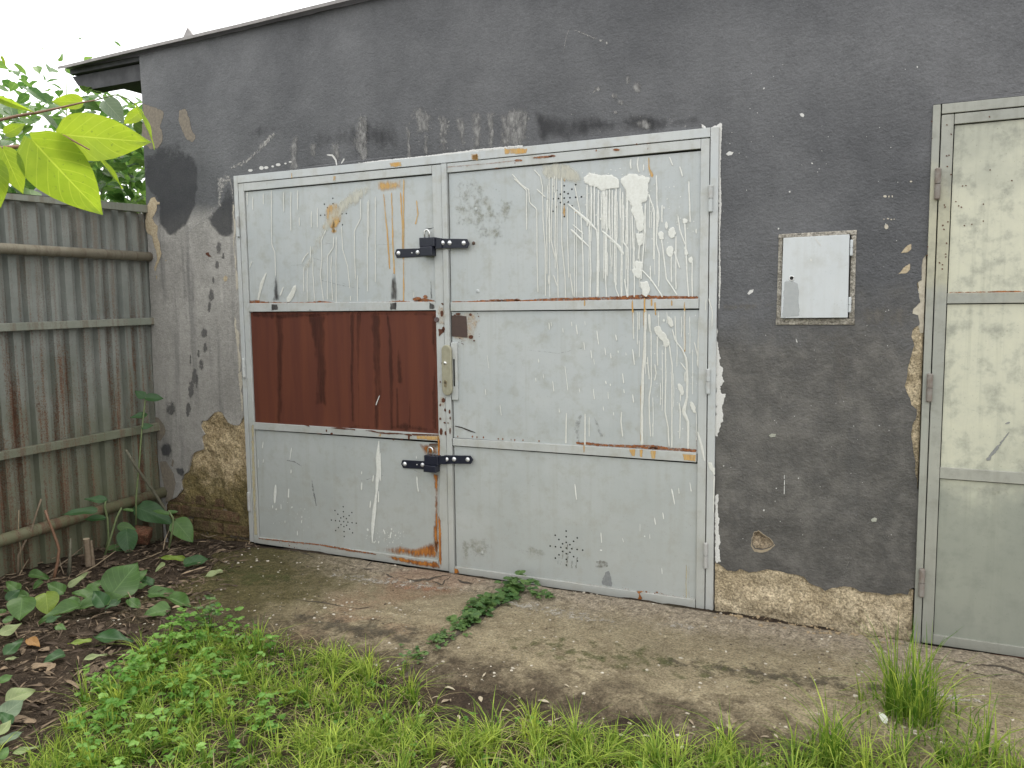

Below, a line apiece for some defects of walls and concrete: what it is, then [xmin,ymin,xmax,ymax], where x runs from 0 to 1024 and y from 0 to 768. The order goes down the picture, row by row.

water stain [355,117,367,160]
corrosion [472,148,555,165]
water stain [406,77,674,157]
water stain [145,149,234,312]
corrosion [323,205,339,232]
corrosion [380,180,698,344]
water stain [167,329,207,417]
flaking render [899,244,927,488]
flaking render [160,412,254,544]
corrosion [391,474,442,568]
flaking render [751,530,775,553]
flaking render [715,562,914,642]